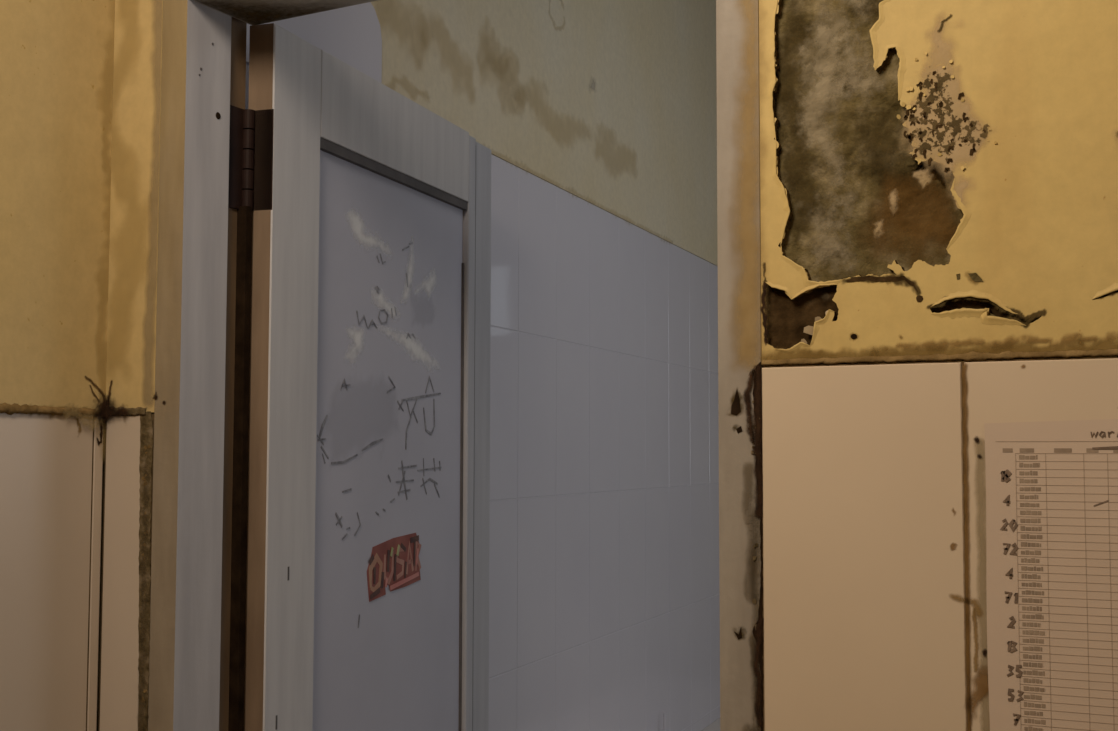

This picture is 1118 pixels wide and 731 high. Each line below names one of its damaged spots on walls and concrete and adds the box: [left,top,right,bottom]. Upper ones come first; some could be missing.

spalling [761,0,997,352]
crack [843,273,1046,328]
crack [1092,282,1118,300]
water stain [744,334,1118,731]